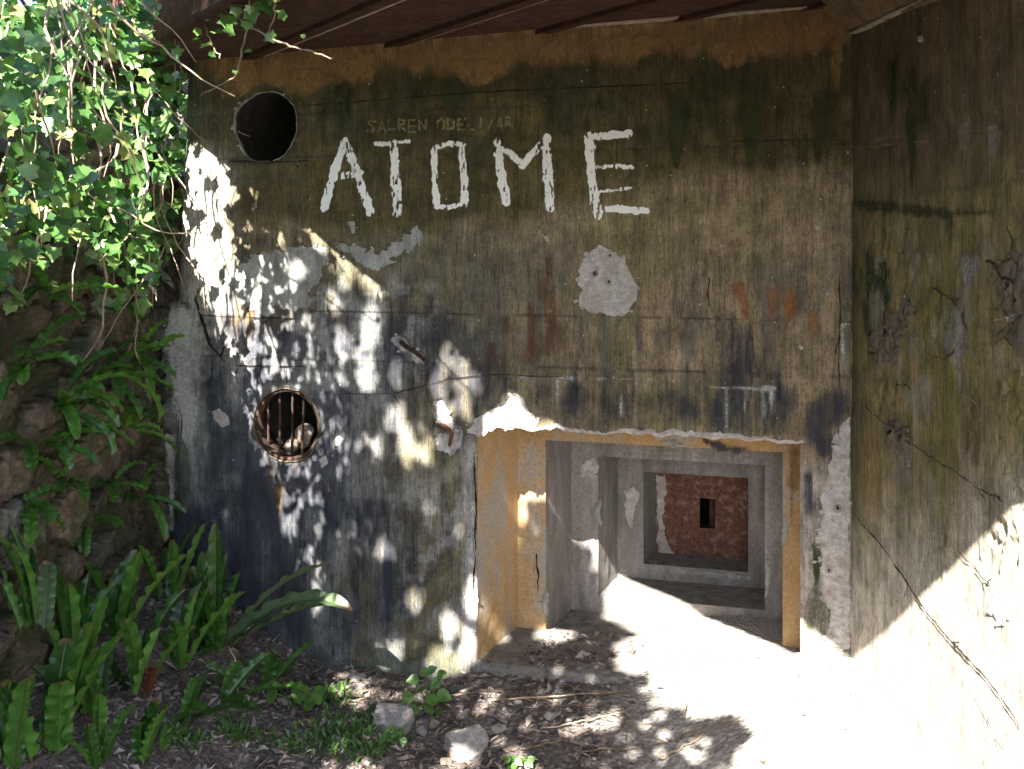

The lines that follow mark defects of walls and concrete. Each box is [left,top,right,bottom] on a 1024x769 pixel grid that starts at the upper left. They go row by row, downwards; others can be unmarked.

damp [222,45,390,131]
damp [406,14,850,168]
crack [194,289,305,374]
peeling [201,221,426,318]
spalling [574,245,640,317]
crack [985,227,1022,347]
spalling [433,392,804,456]
spalling [809,417,852,654]
crack [851,509,1020,752]